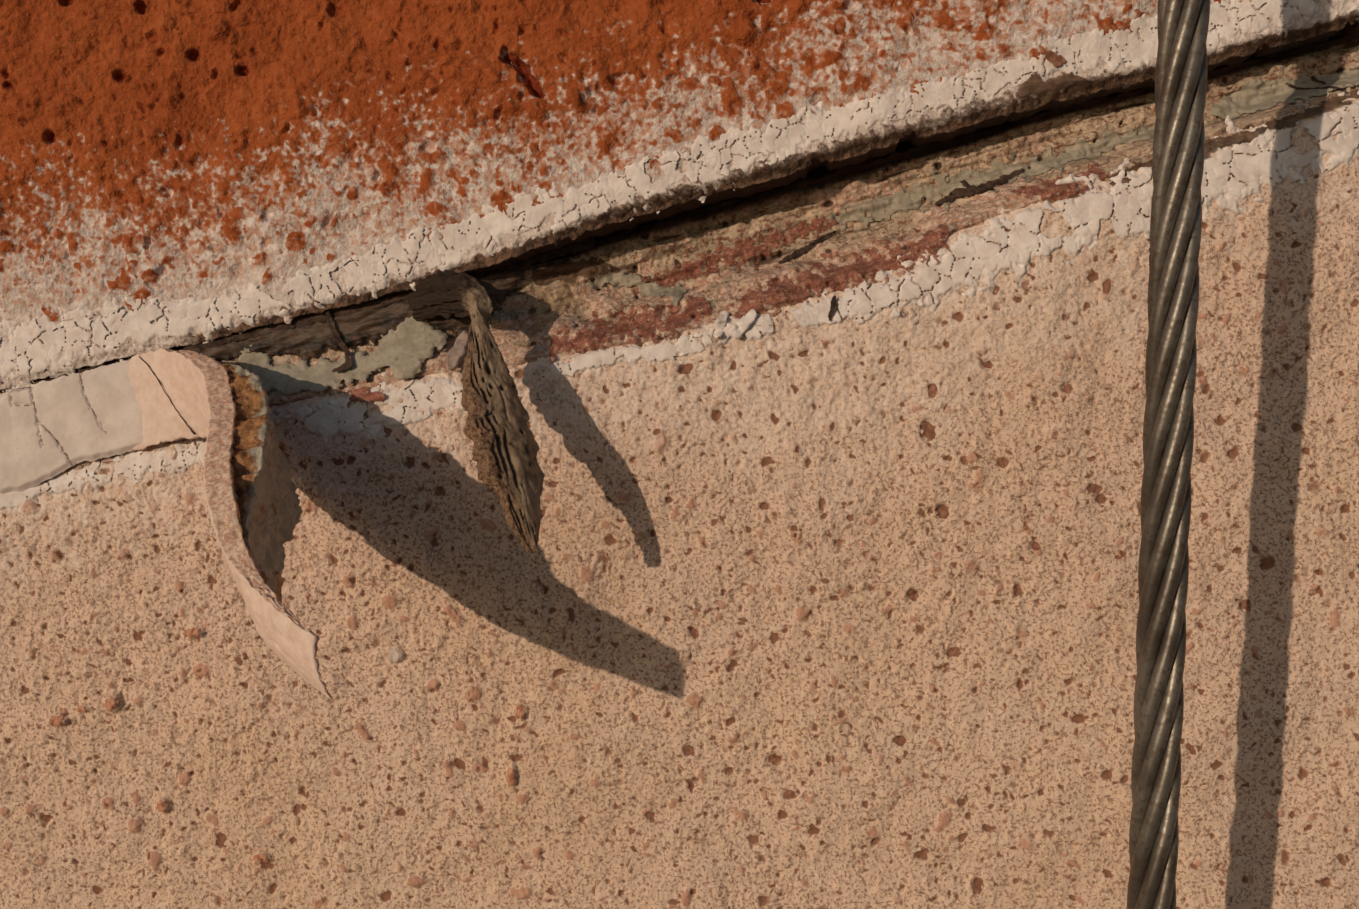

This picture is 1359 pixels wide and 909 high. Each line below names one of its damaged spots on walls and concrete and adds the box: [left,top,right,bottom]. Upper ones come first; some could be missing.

crack [1206,0,1359,57]
crack [1201,76,1359,221]
crack [0,13,1158,510]
peeling [349,386,386,404]
peeling [407,270,545,553]